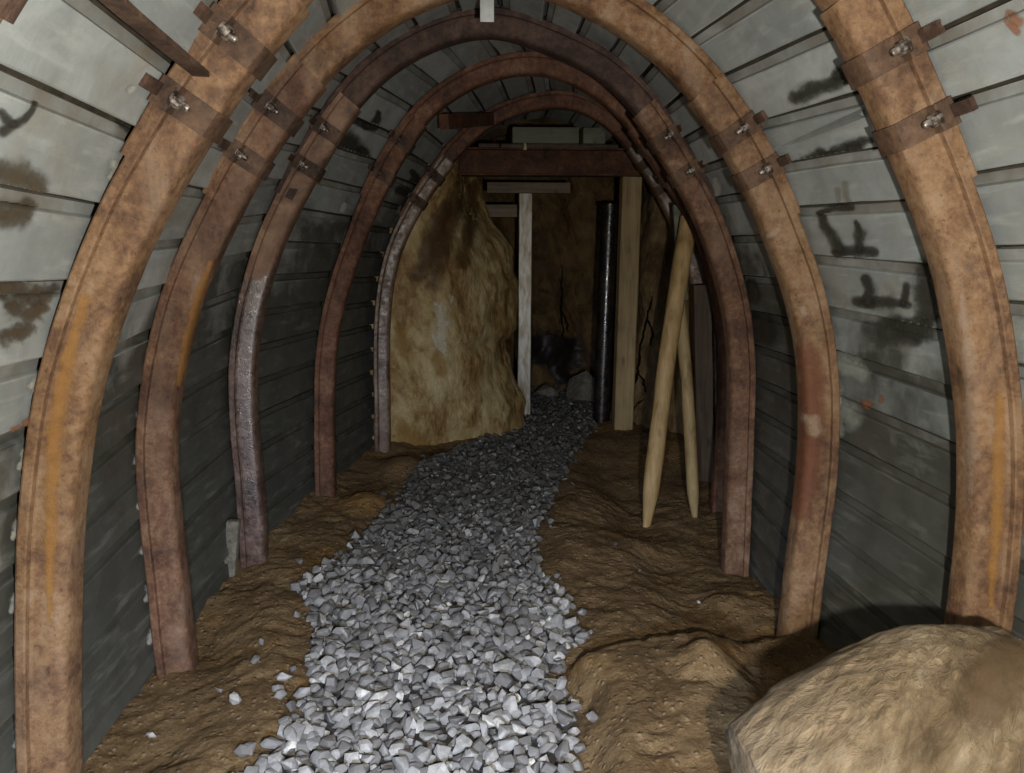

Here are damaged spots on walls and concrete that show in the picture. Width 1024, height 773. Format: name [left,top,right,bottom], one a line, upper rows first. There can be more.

damp [789,66,848,104]
damp [0,161,47,227]
damp [816,189,879,258]
damp [0,281,58,346]
rust [178,261,212,386]
damp [852,261,940,347]
rust [46,297,88,614]
rust [989,397,1004,607]